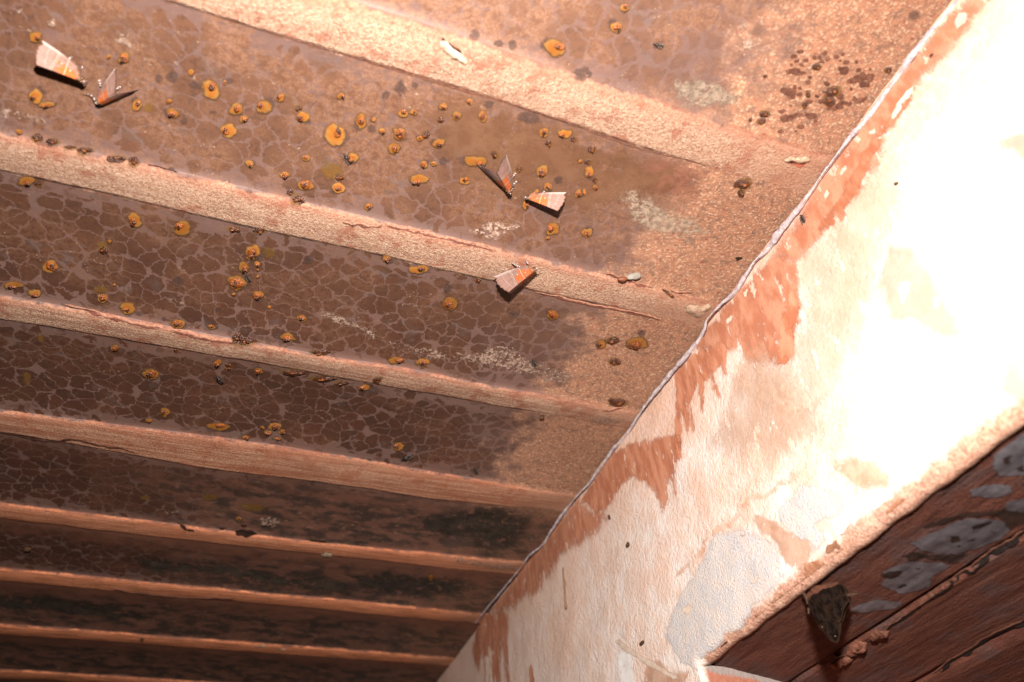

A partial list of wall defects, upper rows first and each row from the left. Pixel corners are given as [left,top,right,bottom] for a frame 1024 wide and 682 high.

crack [243,23,721,172]
rust [15,129,93,156]
rust [106,156,140,167]
rust [322,109,446,194]
spalling [784,156,810,168]
crack [344,222,495,252]
crack [65,304,235,344]
leakage [390,342,575,382]
leakage [446,0,989,682]
leakage [421,507,529,549]
peeling [850,433,1024,613]
peeling [666,529,784,670]